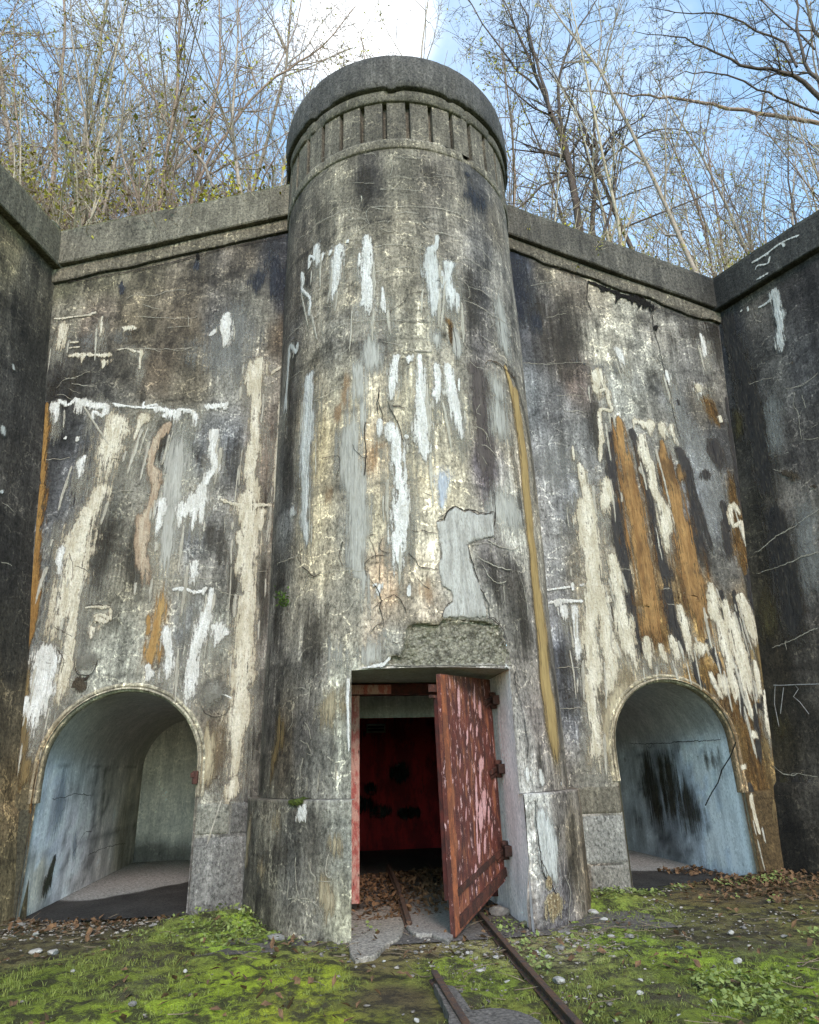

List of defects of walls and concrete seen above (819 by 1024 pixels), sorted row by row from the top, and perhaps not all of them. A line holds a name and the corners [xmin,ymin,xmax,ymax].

crack [317,385,404,475]
rust [702,396,720,427]
rust [29,402,52,646]
rust [141,583,168,666]
crack [258,493,528,648]
spalling [384,506,511,667]
rust [504,365,559,763]
rust [612,415,668,655]
rust [656,440,777,821]
leakage [635,747,707,833]